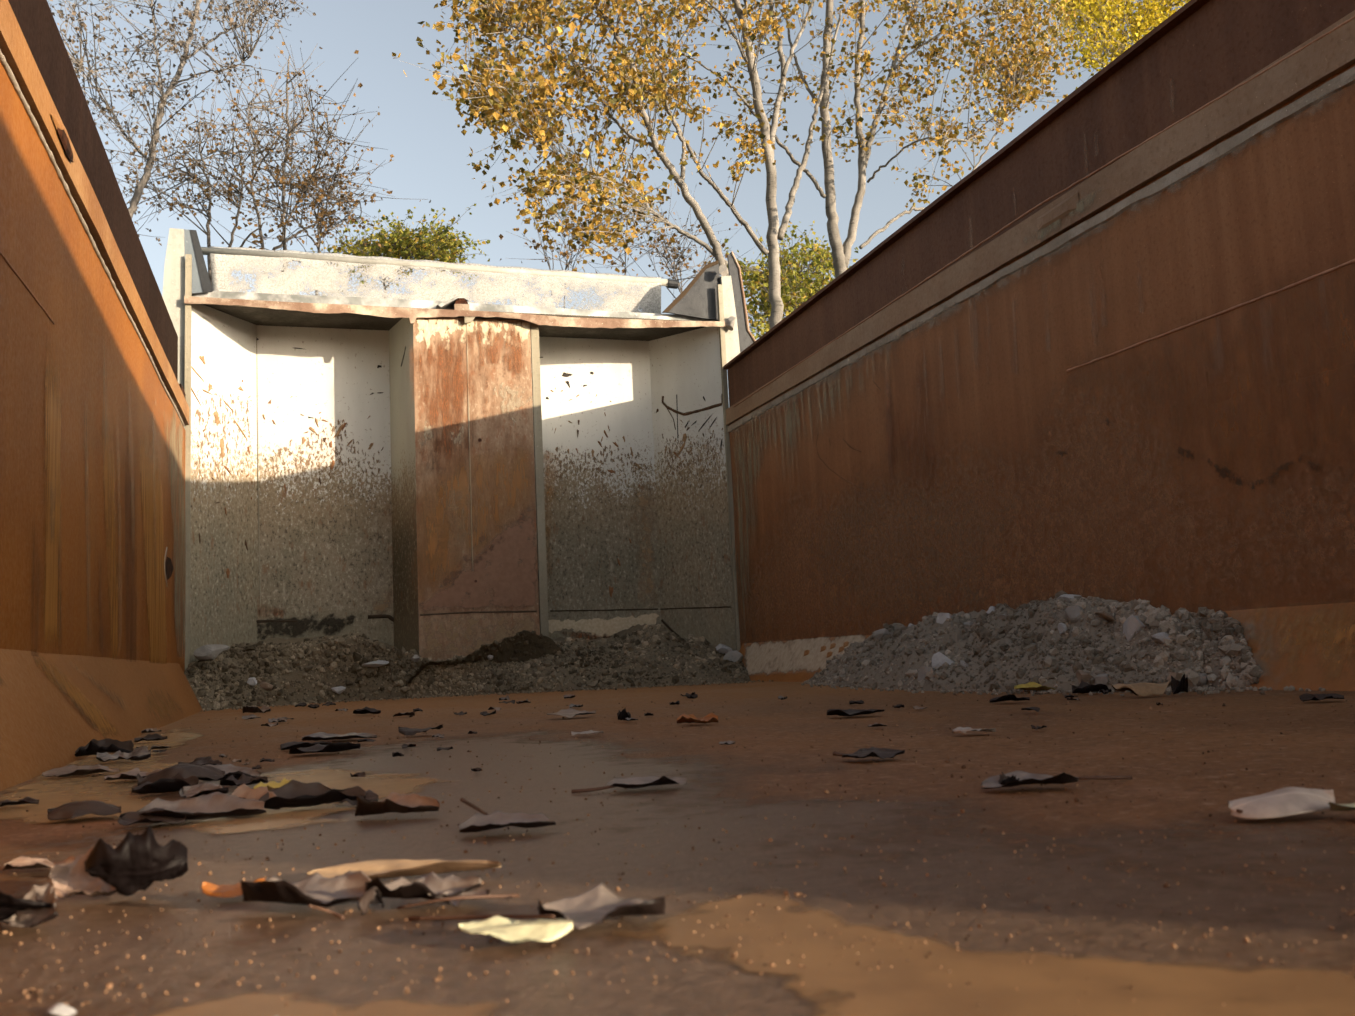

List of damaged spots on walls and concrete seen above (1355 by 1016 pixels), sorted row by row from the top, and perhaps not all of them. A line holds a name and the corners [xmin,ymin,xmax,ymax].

rust [44,372,61,643]
rust [414,328,524,461]